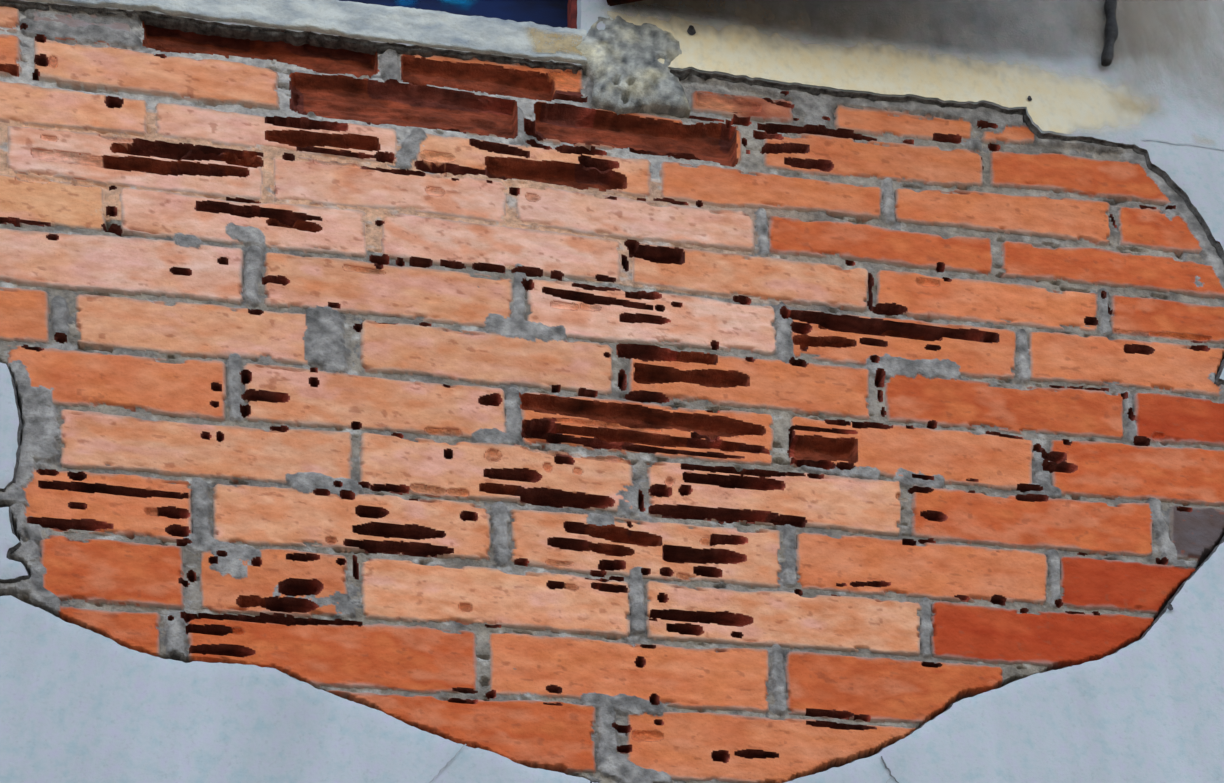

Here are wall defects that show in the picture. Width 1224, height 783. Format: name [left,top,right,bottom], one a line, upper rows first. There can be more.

spalling [289,72,518,139]
spalling [780,306,1000,352]
spalling [519,390,770,459]
spalling [787,425,858,470]
spalling [38,480,189,499]
spalling [479,482,615,509]
spalling [681,463,806,491]
spalling [648,504,807,528]
spalling [352,521,446,540]
spalling [563,521,662,547]
spalling [343,539,454,558]
spalling [662,544,747,564]